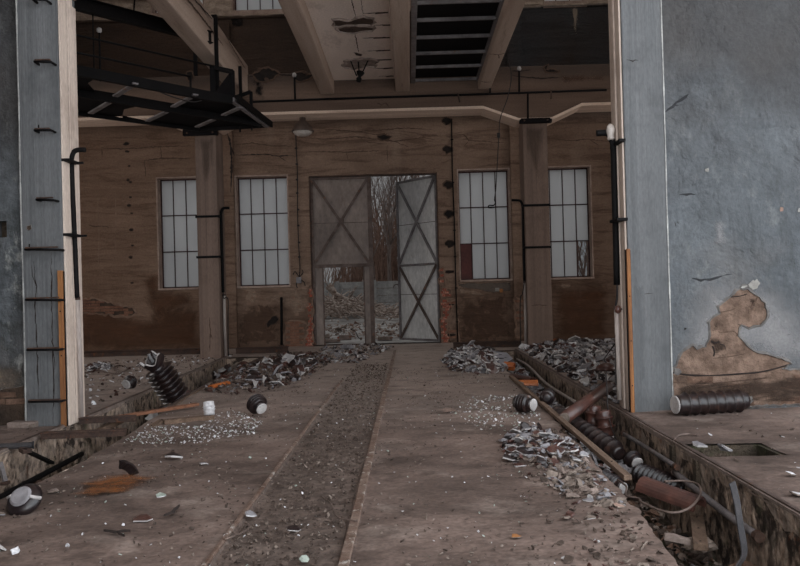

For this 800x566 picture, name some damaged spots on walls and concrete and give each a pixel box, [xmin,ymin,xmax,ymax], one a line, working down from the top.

spalling [331,15,377,34]
spalling [341,52,380,70]
crack [31,258,55,407]
spalling [82,297,137,319]
spalling [266,285,315,347]
spalling [438,266,460,343]
spalling [673,279,800,409]